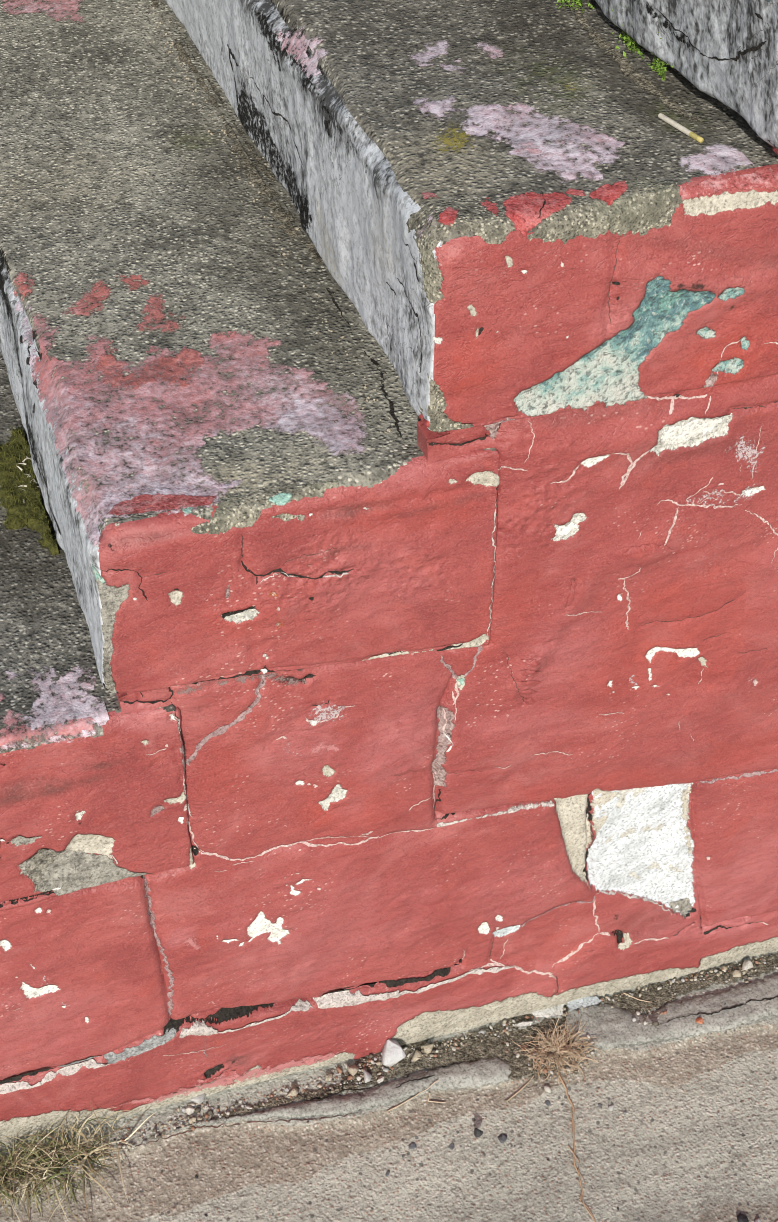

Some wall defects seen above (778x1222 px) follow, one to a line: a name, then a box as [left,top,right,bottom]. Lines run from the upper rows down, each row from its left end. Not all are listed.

peeling [406,96,778,304]
peeling [14,272,368,546]
peeling [419,276,750,439]
crack [241,534,353,584]
crack [745,510,778,563]
crack [103,654,316,774]
crack [194,644,573,872]
spalling [0,834,151,896]
peeling [217,911,289,946]
crack [0,875,778,1094]
peeling [553,769,778,918]
crack [135,1075,435,1147]